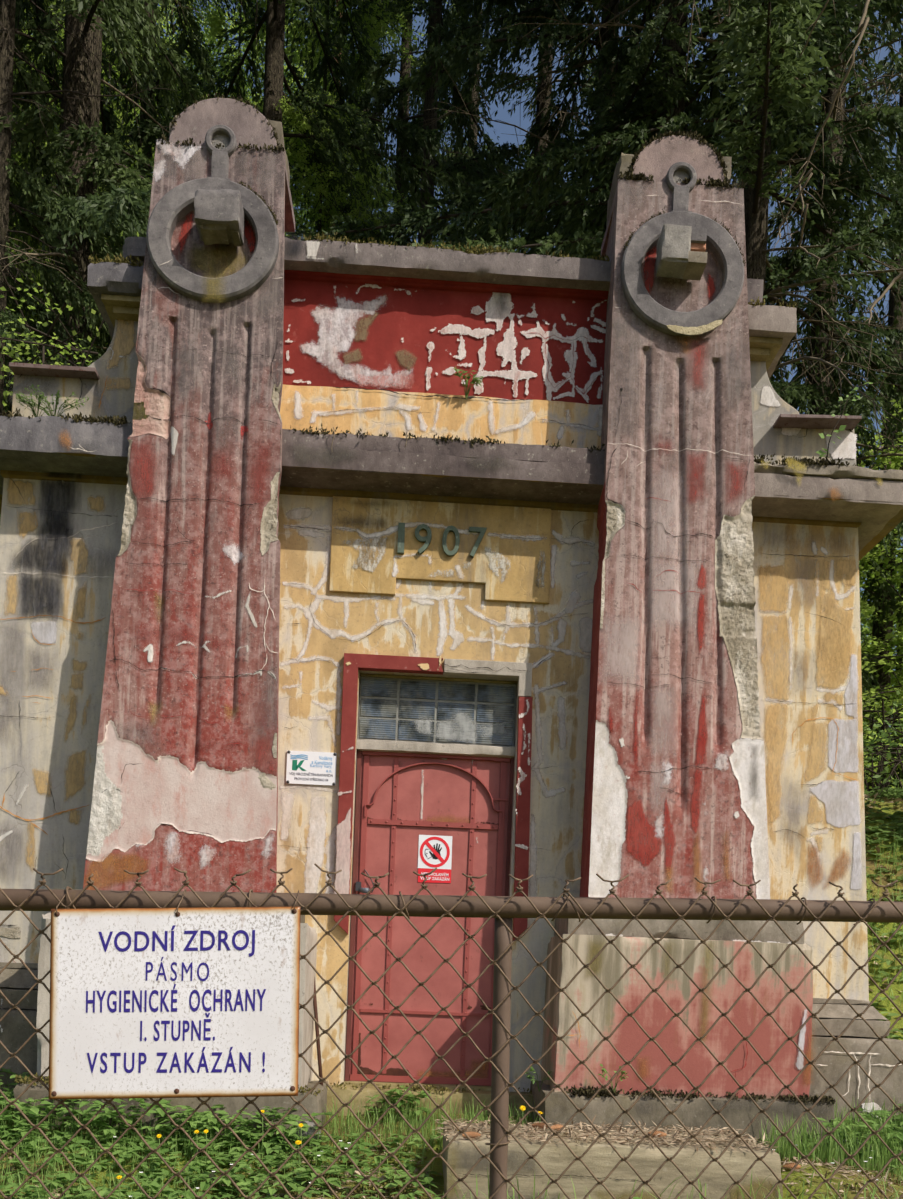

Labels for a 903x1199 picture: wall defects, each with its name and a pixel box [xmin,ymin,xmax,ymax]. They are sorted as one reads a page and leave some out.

peeling [34,770,51,795]
leakage [16,472,81,616]
crack [2,477,416,747]
flaking render [66,720,352,894]
peeling [271,325,440,431]
crack [444,654,565,691]
peeling [425,292,607,439]
crack [319,332,750,594]
flaking render [588,707,675,897]
peeling [691,695,707,833]
flaking render [697,465,793,899]
peeling [805,542,862,890]